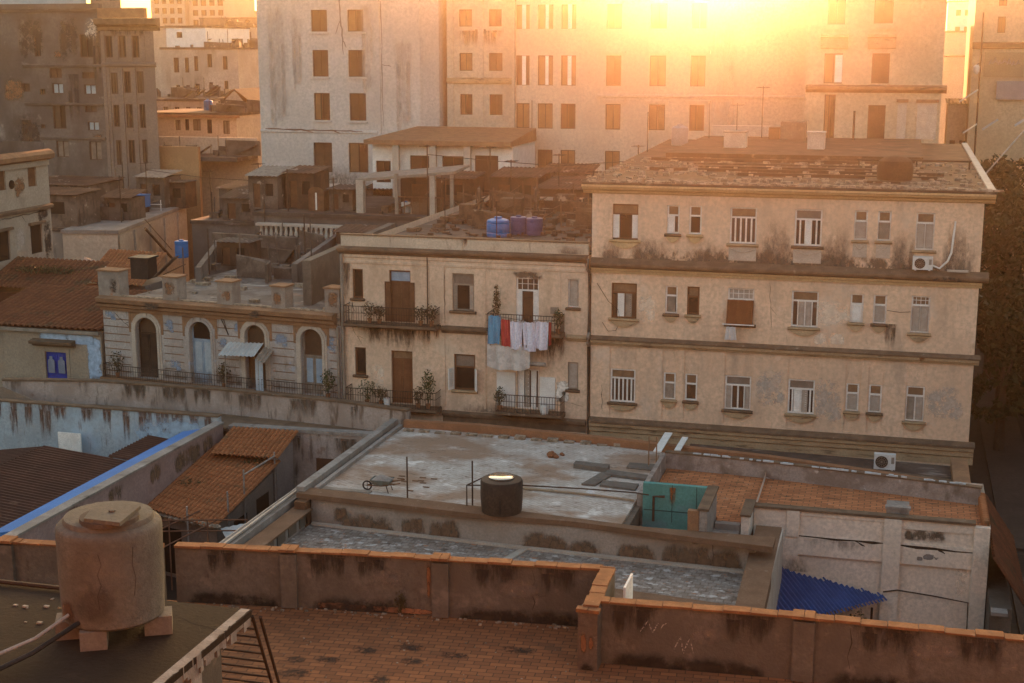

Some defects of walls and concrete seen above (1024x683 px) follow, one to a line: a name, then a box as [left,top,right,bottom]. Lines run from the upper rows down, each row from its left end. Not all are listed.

leakage [635,246,912,269]
leakage [334,508,459,538]
leakage [523,534,597,553]
crack [799,535,973,554]
leakage [309,554,383,574]
leakage [475,564,517,583]
leakage [539,568,575,588]
leakage [317,600,414,615]
leakage [727,614,774,637]
leakage [862,627,913,646]
leakage [960,636,998,658]